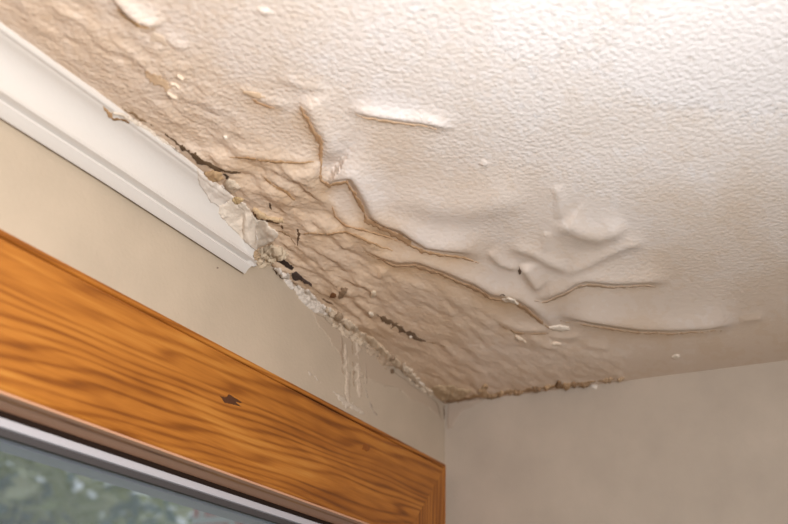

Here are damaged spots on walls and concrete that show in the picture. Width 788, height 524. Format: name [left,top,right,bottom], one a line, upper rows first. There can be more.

crack [253,203,301,246]
spalling [0,0,633,404]
crack [376,314,445,347]
water stain [312,306,618,429]